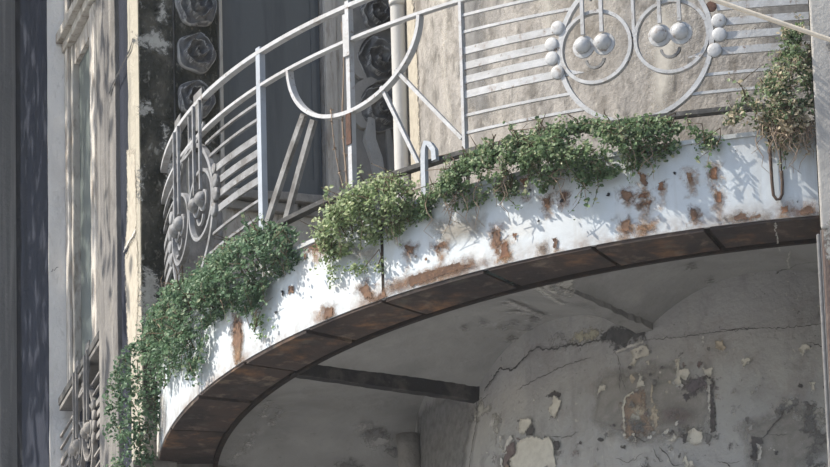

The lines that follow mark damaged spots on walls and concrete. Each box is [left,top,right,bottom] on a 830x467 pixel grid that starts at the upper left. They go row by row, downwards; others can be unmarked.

corrosion [621,172,666,236]
corrosion [356,241,486,302]
corrosion [490,227,517,263]
corrosion [231,314,243,360]
crack [644,324,822,347]
peeling [471,398,561,467]
peeling [546,391,561,418]
leakage [595,365,709,443]
flaking render [597,340,718,467]
flaking render [733,417,778,467]
leakage [745,410,822,467]